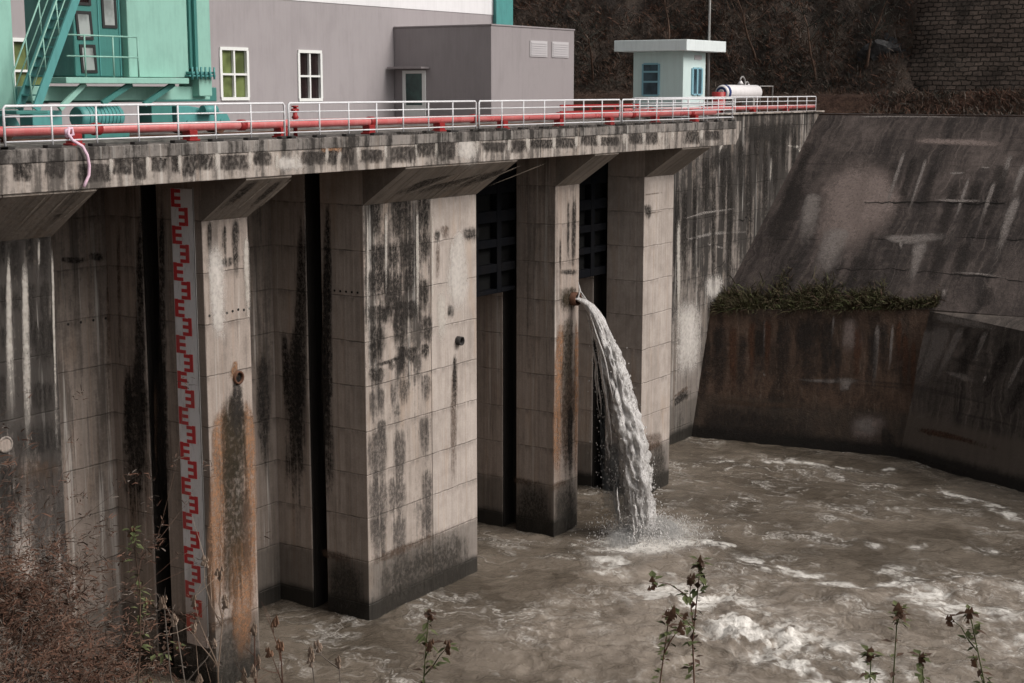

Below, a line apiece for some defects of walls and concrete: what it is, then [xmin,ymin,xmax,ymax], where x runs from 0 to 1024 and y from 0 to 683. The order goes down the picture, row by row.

damp [13,163,31,181]
damp [124,210,169,514]
corrosion [209,362,256,644]
damp [282,221,307,473]
damp [323,551,364,619]
damp [365,165,541,612]
damp [24,121,1024,411]
corrosion [554,320,579,468]
crack [864,190,1003,205]